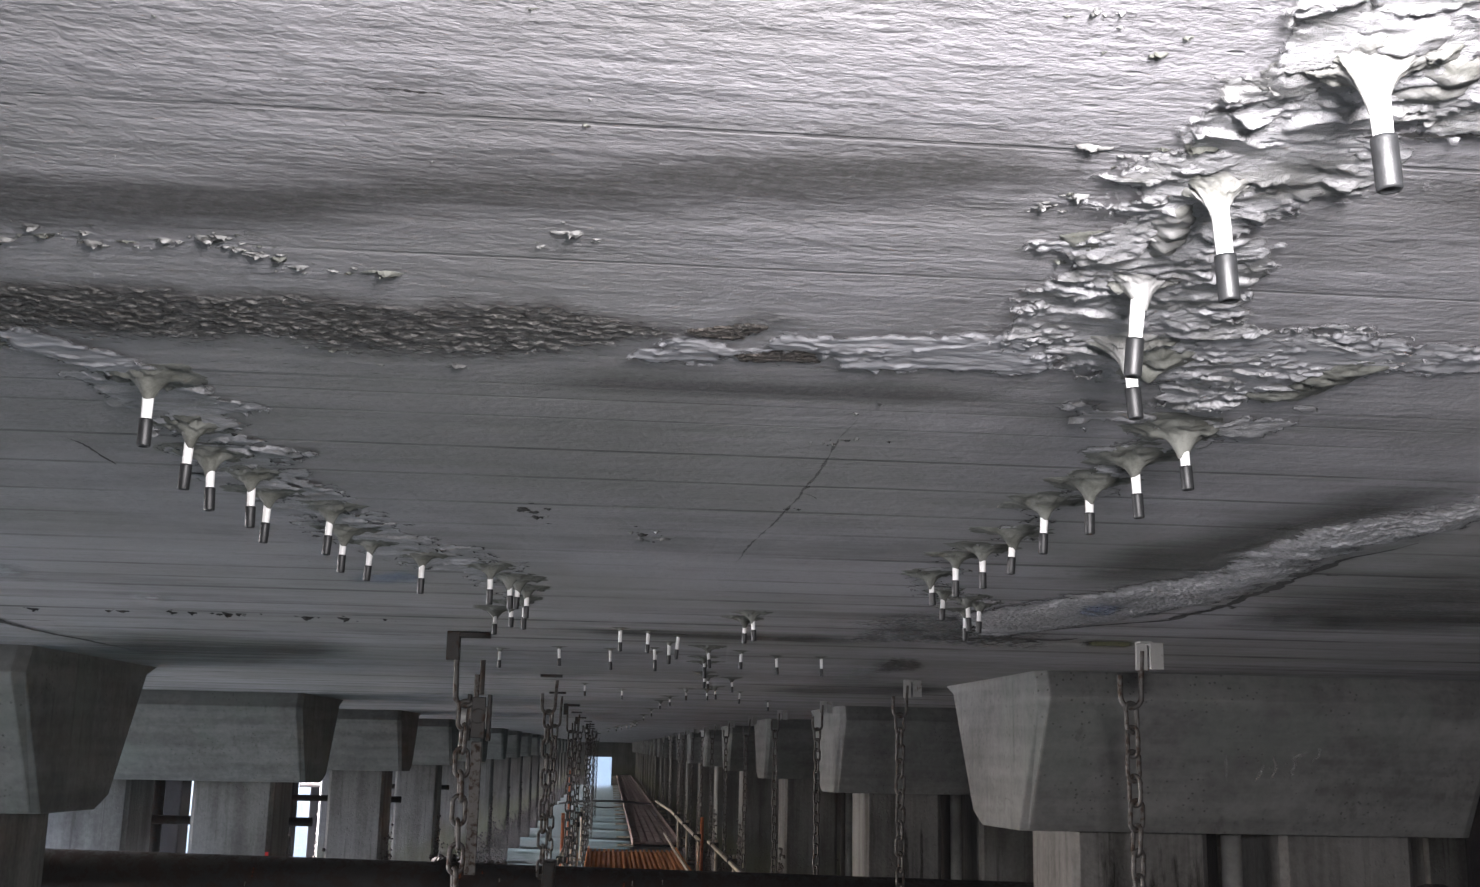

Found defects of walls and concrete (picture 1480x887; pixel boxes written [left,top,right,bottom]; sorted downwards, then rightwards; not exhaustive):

peeling [1359,16,1480,102]
peeling [1256,64,1320,108]
peeling [1349,88,1363,103]
peeling [1075,143,1233,183]
damp [0,156,1051,221]
peeling [1028,193,1090,212]
peeling [0,220,405,279]
peeling [536,222,604,249]
peeling [1053,230,1115,265]
peeling [1147,203,1196,257]
spalling [0,283,1060,376]
peeling [1245,361,1390,403]